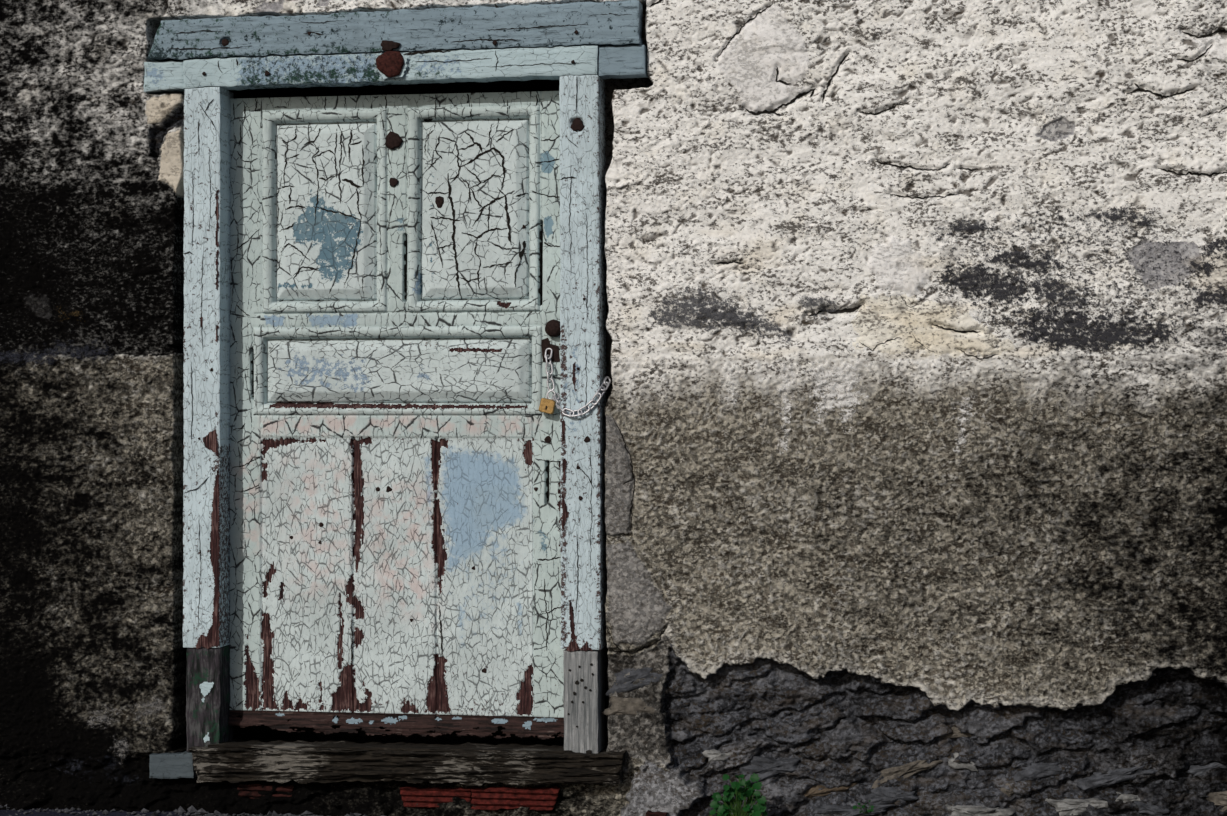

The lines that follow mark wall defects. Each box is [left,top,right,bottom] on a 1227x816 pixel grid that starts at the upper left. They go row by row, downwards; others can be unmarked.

crack [717,3,773,58]
crack [745,53,849,116]
crack [861,101,910,115]
crack [1126,29,1227,117]
crack [873,161,976,199]
crack [1158,168,1227,176]
crack [808,305,862,316]
crack [860,295,998,360]
peeling [566,600,592,652]
water stain [87,698,179,782]
flaking render [602,630,1227,816]